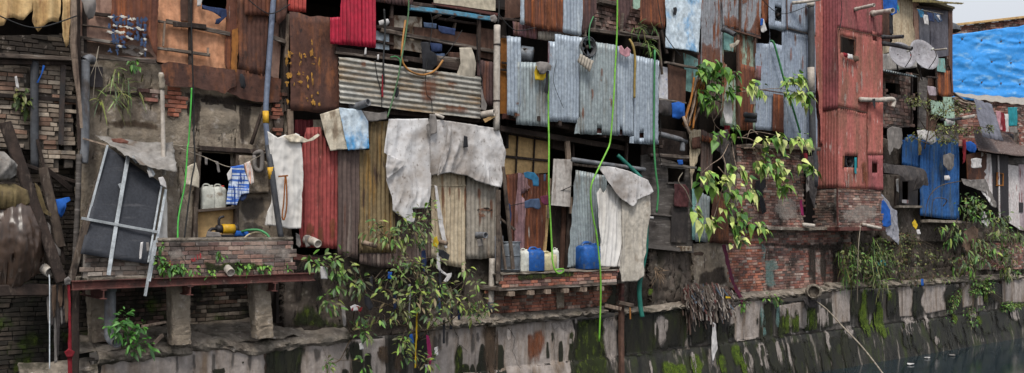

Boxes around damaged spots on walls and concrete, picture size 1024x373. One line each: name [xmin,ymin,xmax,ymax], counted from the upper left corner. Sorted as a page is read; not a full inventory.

water stain [587,277,1024,373]